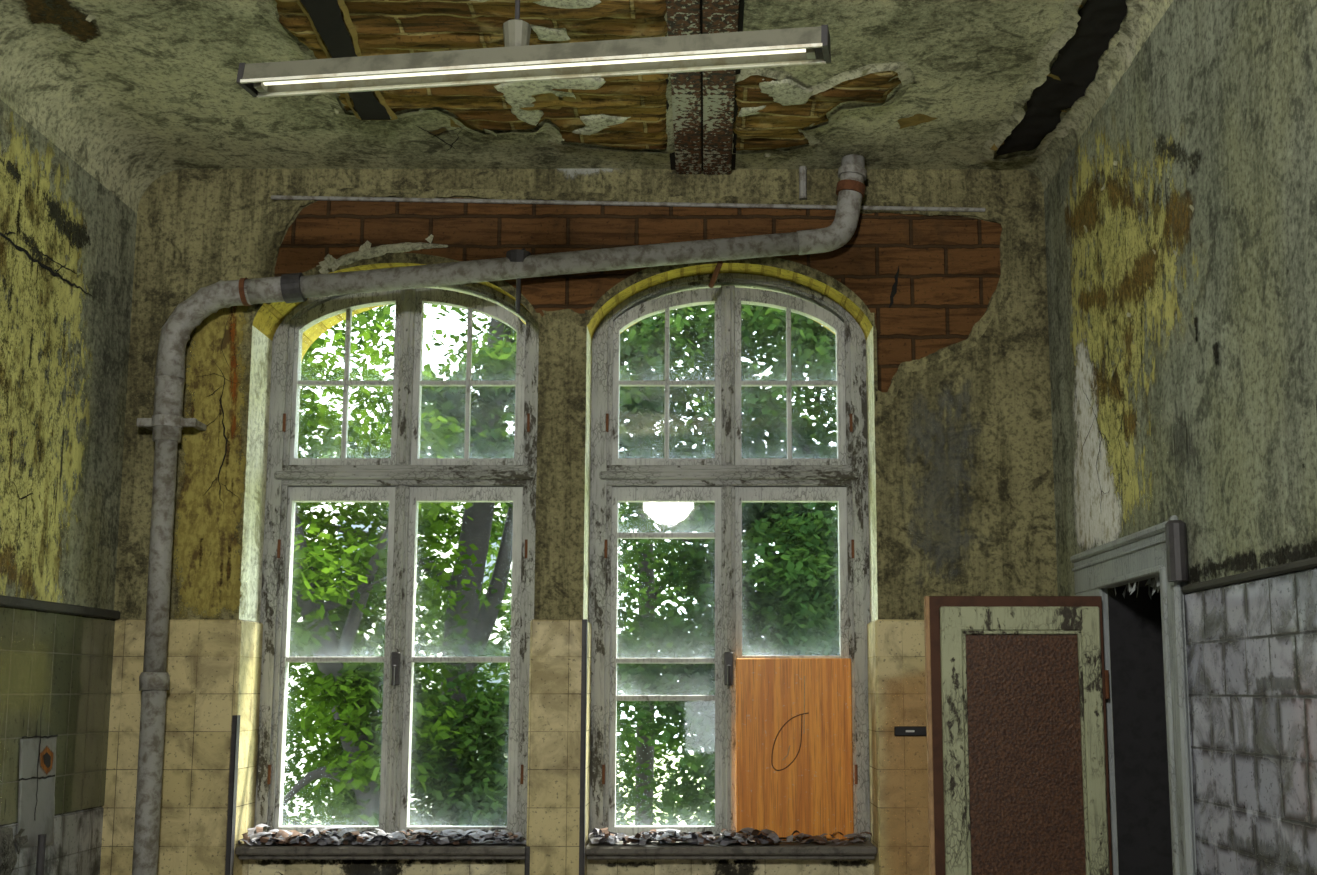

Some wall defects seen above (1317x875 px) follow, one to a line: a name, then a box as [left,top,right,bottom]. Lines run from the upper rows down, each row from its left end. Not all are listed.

peeling [23,0,114,54]
spalling [256,0,668,60]
spalling [323,73,675,154]
spalling [732,62,919,157]
spalling [897,114,938,129]
spalling [263,168,838,278]
peeling [1064,161,1143,238]
crack [0,231,92,296]
spalling [488,202,1013,406]
peeling [1078,191,1194,447]
spalling [0,827,28,875]